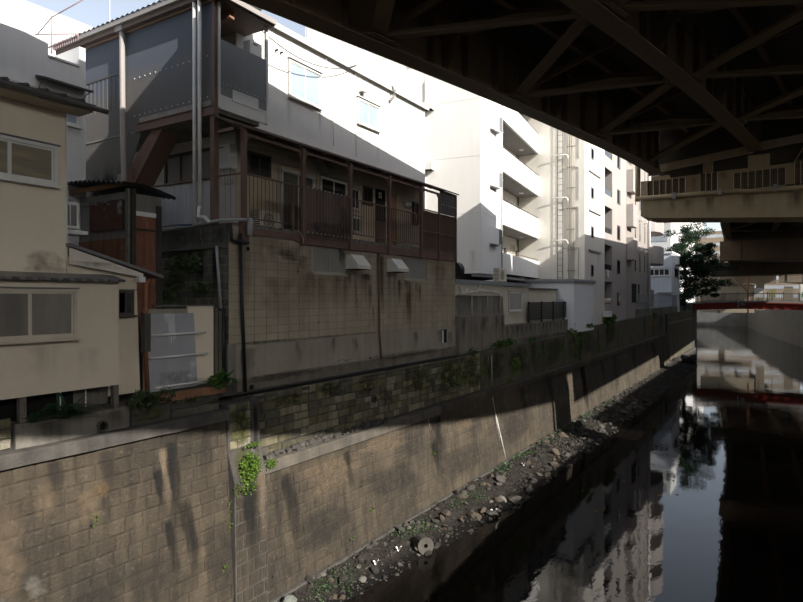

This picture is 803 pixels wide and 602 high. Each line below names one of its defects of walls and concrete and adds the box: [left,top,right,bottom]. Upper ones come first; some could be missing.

water stain [155,445,176,496]